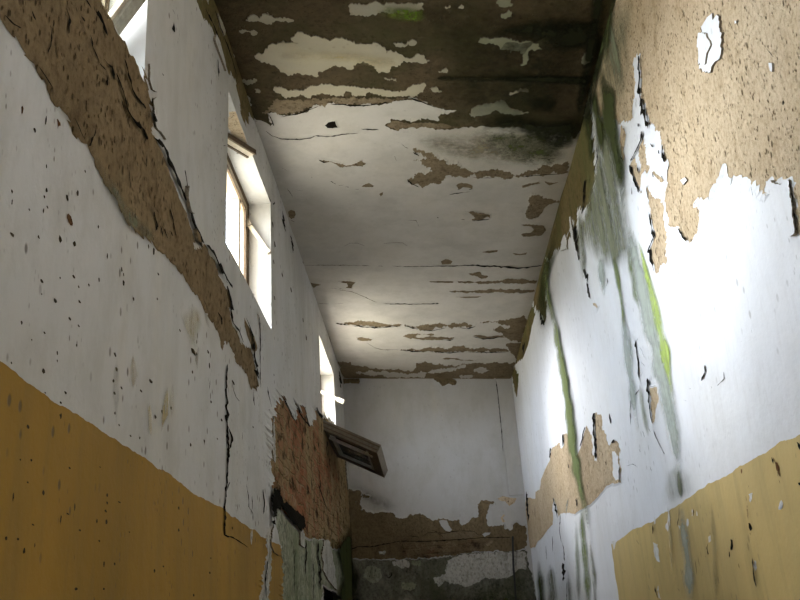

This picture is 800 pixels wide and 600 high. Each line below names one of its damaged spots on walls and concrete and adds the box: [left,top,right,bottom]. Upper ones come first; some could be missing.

spalling [0,0,259,391]
spalling [195,0,800,398]
leakage [436,0,671,385]
crack [209,314,272,547]
spalling [258,388,624,600]
leakage [568,516,596,600]
leakage [622,320,635,409]